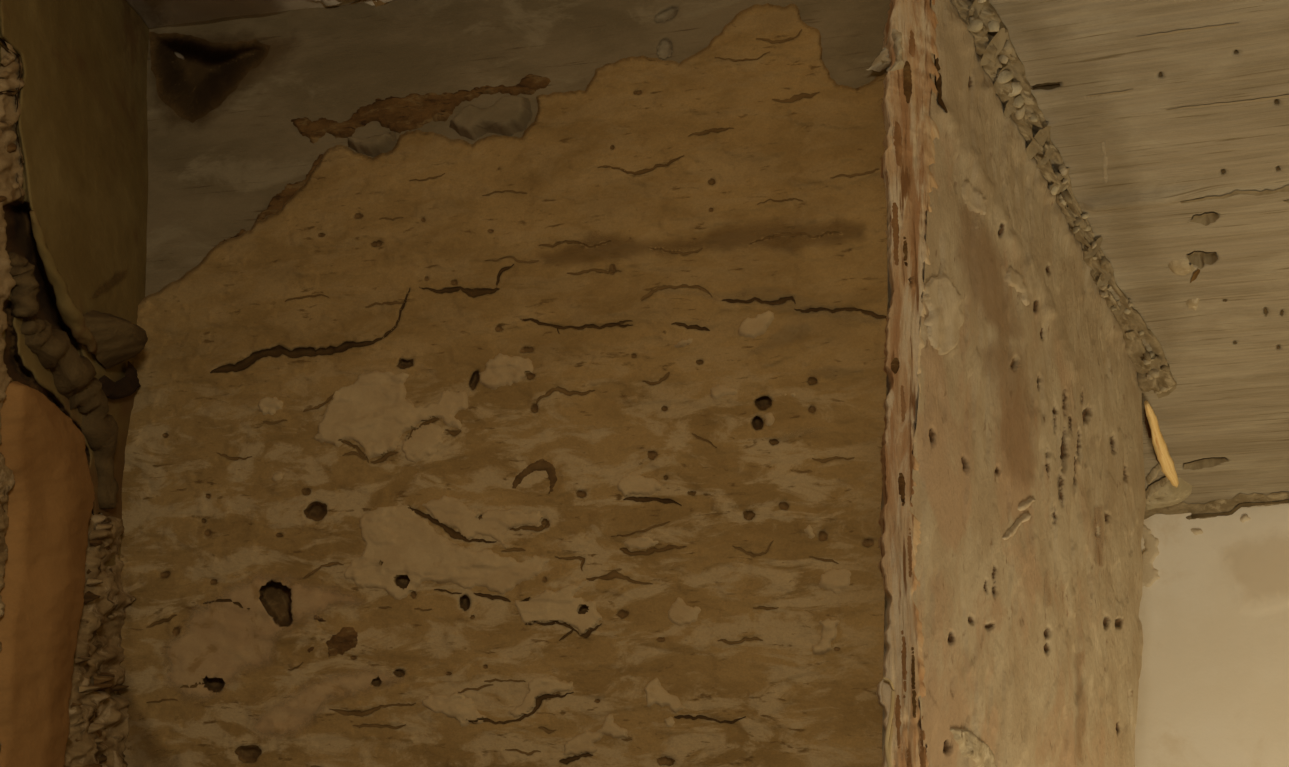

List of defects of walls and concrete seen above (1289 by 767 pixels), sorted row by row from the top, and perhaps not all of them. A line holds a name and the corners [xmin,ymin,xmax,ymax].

crack [715,29,802,62]
crack [772,92,820,103]
spalling [0,40,25,617]
crack [210,240,622,373]
crack [520,247,887,334]
crack [263,394,334,424]
spalling [145,0,964,767]
crack [536,386,595,405]
crack [341,417,461,464]
crack [812,455,855,463]
spalling [1142,492,1289,587]
crack [718,606,779,644]